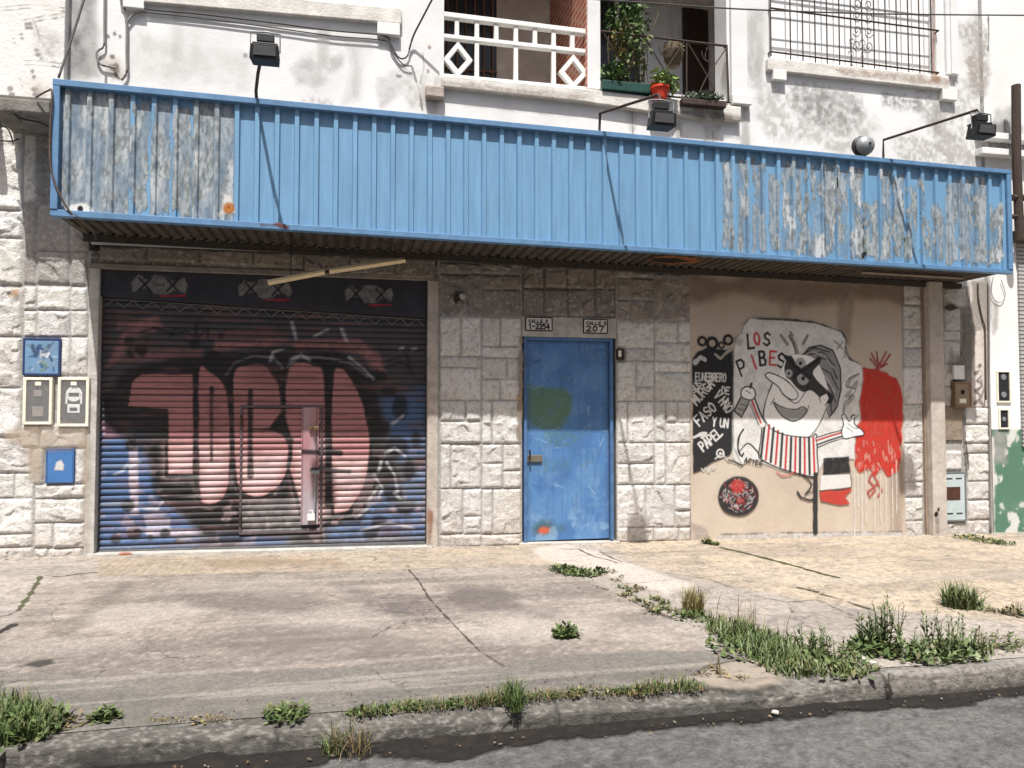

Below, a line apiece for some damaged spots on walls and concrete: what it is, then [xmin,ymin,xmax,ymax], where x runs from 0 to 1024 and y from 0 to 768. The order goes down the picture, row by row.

peeling [60,89,234,221]
water stain [793,85,860,131]
peeling [722,156,1004,406]
crack [408,569,505,666]